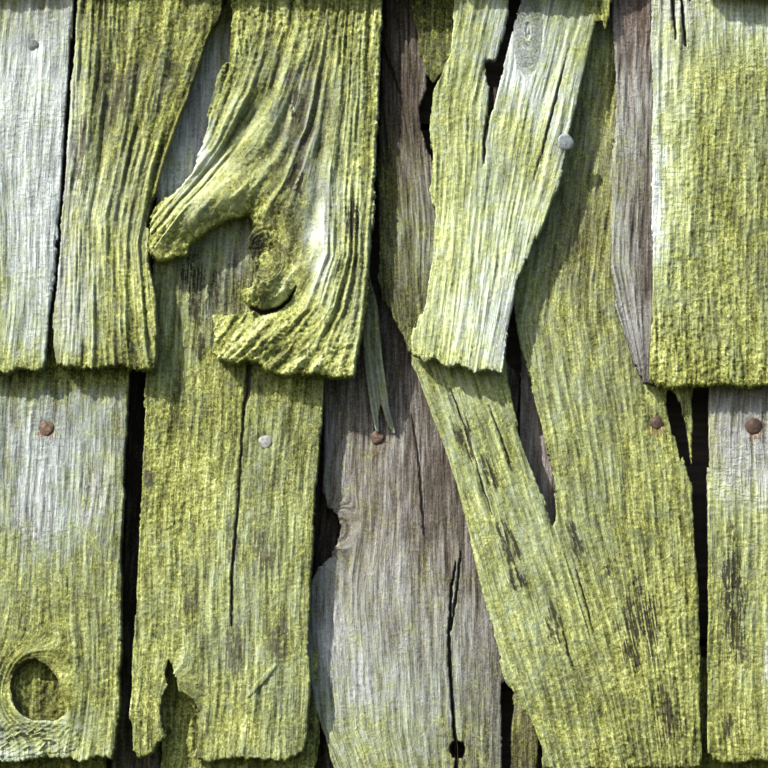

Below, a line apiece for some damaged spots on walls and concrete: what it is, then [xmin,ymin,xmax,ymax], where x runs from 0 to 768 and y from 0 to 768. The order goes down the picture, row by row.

crack [482,116,490,163]
crack [230,365,251,626]
crack [448,558,461,768]